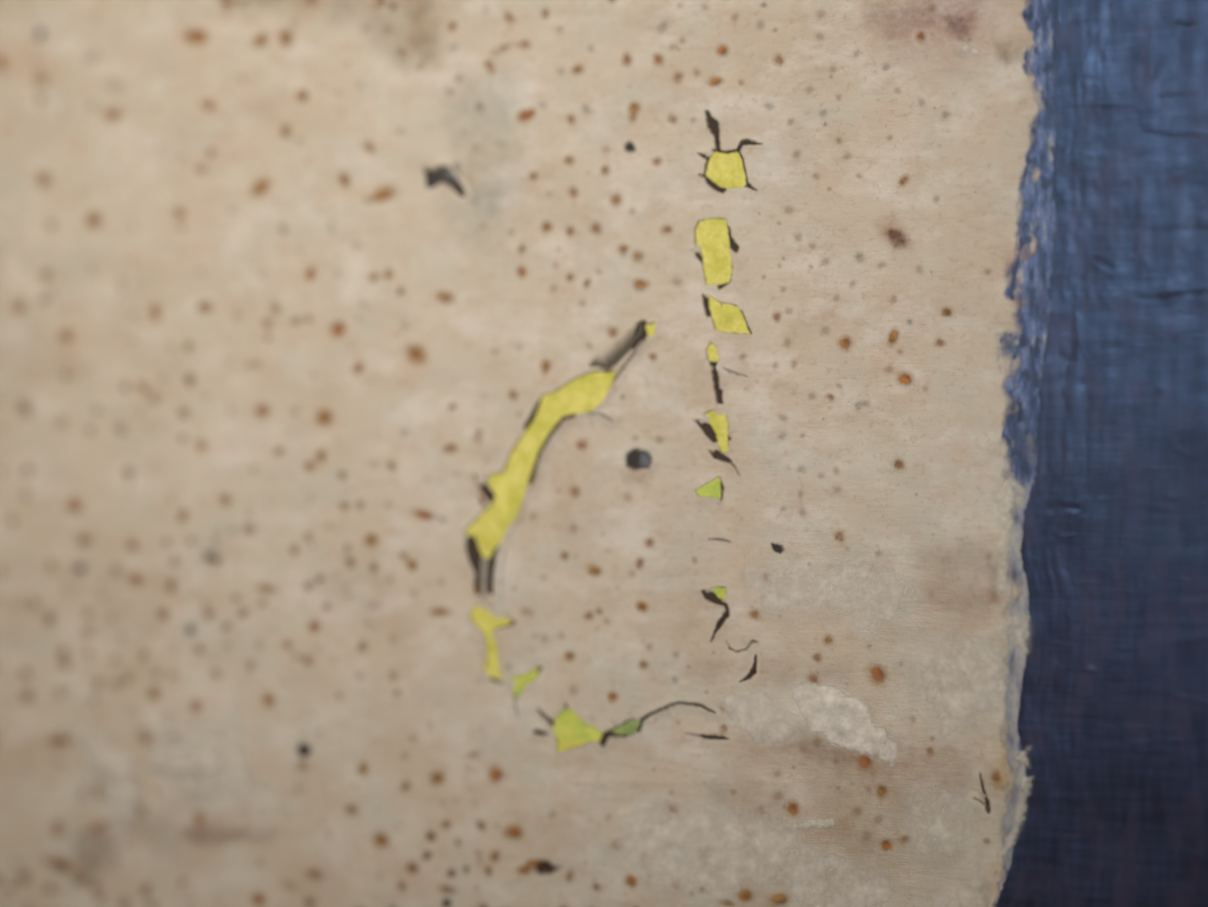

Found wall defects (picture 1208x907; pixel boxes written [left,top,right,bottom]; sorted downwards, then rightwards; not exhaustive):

corrosion [254,32,291,45]
corrosion [519,109,535,120]
corrosion [373,189,391,201]
peeling [682,100,773,511]
corrosion [409,348,424,361]
peeling [455,310,726,762]
crack [699,528,740,552]
crack [719,630,767,691]
corrosion [871,667,884,682]
crack [677,724,738,749]
corrosion [506,827,521,837]
corrosion [725,888,751,906]